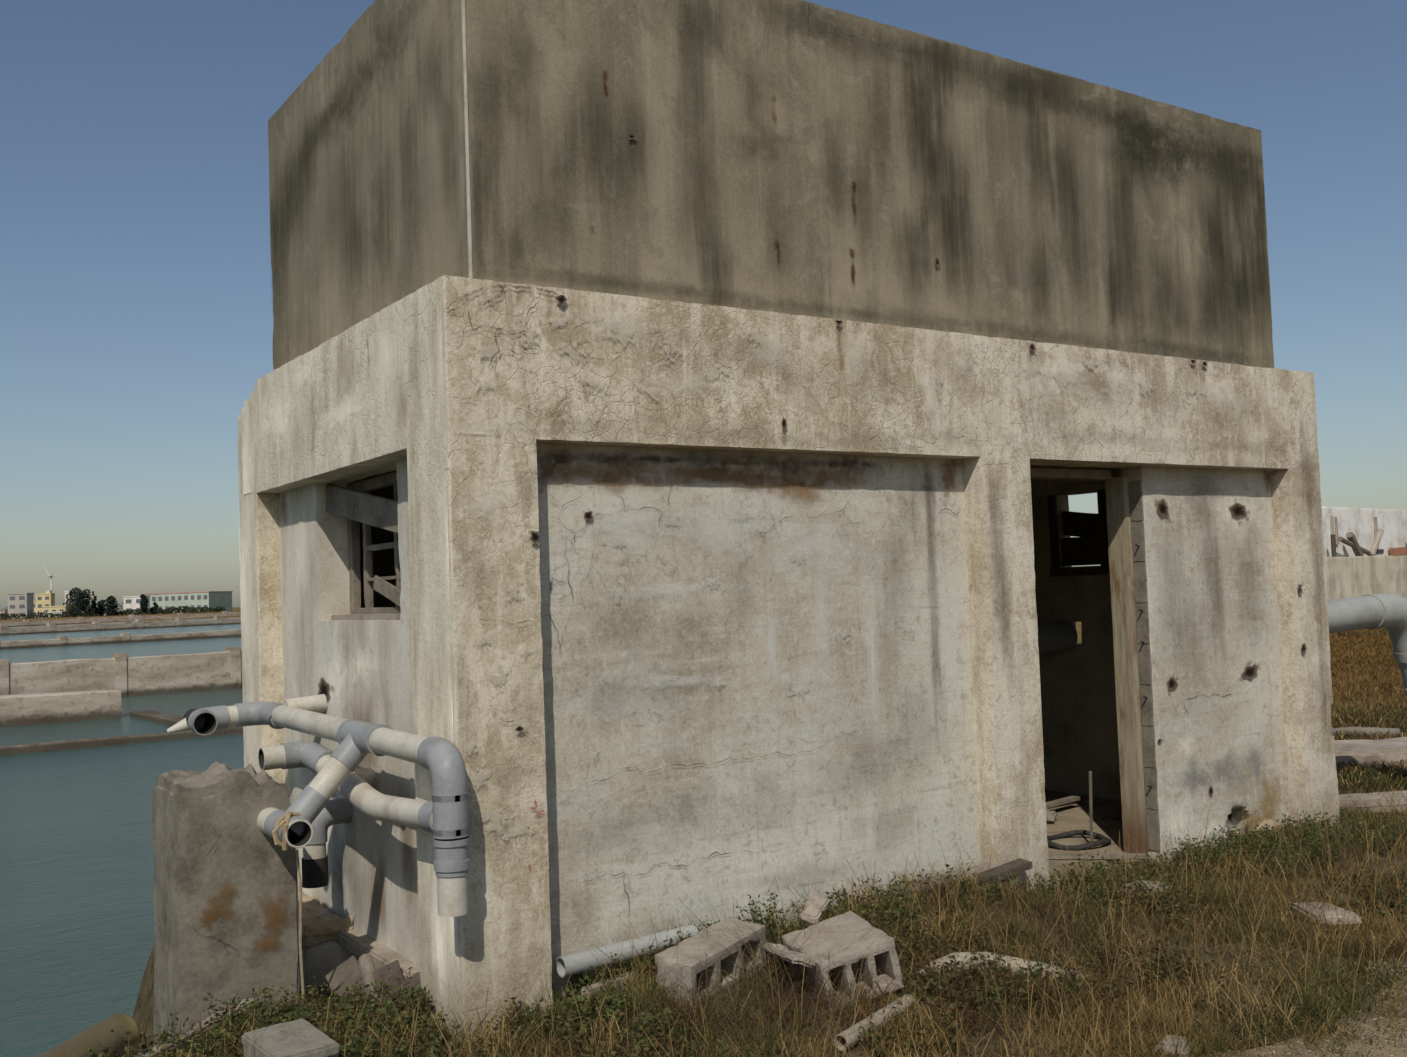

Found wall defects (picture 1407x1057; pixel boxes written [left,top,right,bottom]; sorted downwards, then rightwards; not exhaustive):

crack [449,284,745,400]
rust [670,458,856,497]
spalling [1154,498,1171,521]
spalling [1229,498,1250,525]
spalling [1167,674,1179,695]
spalling [1238,659,1261,681]
crack [585,850,746,917]
damp [436,917,457,973]